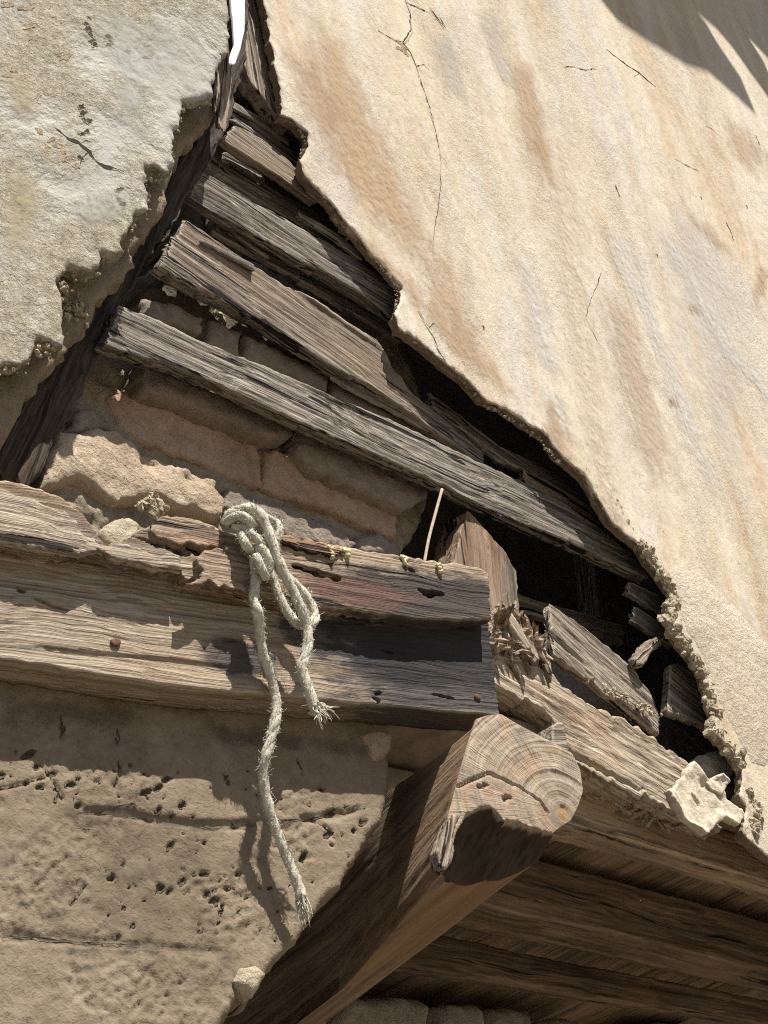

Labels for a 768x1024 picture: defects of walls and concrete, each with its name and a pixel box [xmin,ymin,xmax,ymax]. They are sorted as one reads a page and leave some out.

spalling [82,15,155,59]
crack [565,50,656,87]
spalling [77,103,94,136]
crack [378,0,441,249]
spalling [35,127,85,169]
crack [55,127,124,172]
spalling [58,255,122,335]
spalling [0,342,57,376]
spalling [450,370,561,464]
spalling [616,498,764,841]
spalling [14,749,81,808]
spalling [117,773,178,808]